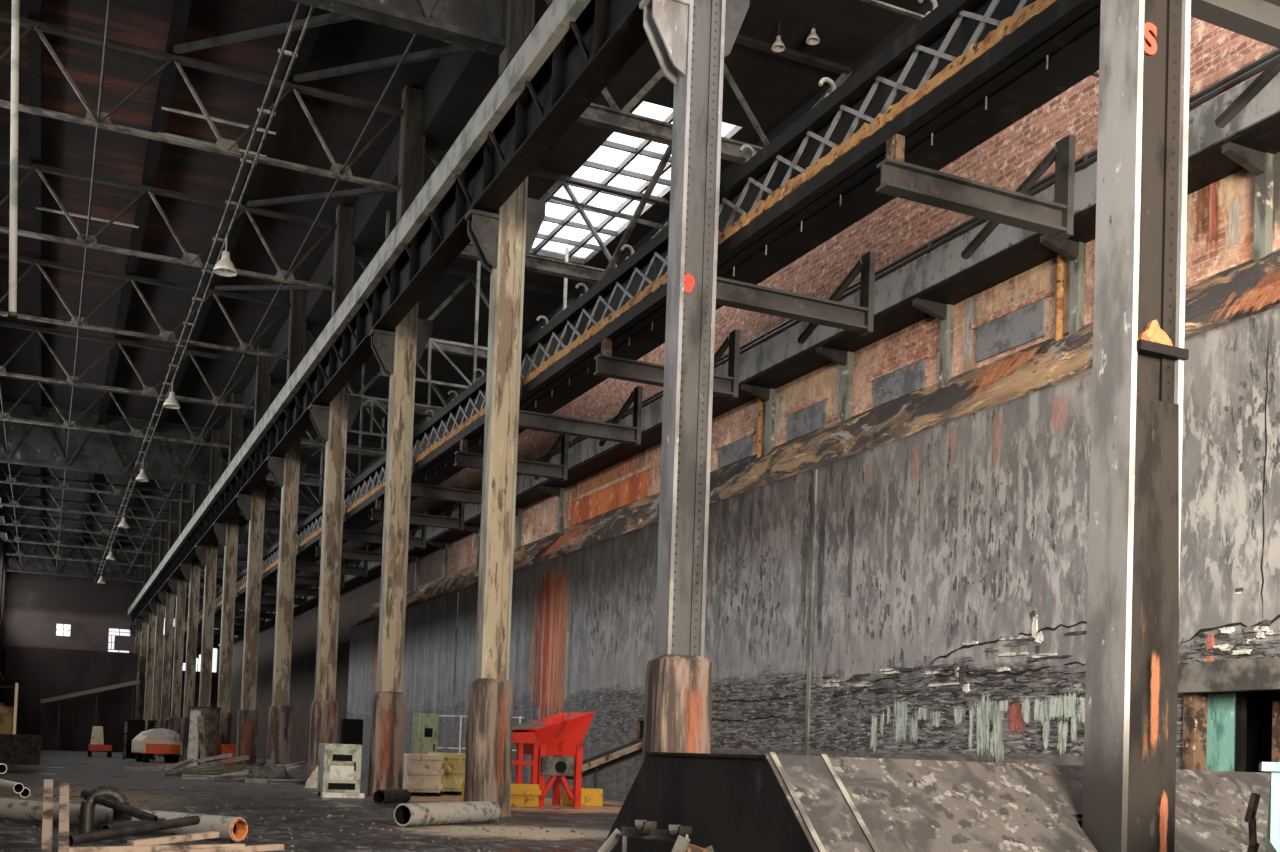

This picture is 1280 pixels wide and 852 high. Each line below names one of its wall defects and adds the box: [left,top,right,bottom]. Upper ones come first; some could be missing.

corrosion [1212,267,1280,319]
corrosion [968,347,1045,401]
corrosion [530,452,660,720]
spalling [1195,619,1280,656]
corrosion [497,699,506,786]
corrosion [685,674,702,753]
peeling [822,610,1086,763]
corrosion [1151,657,1159,742]
corrosion [1160,796,1168,852]